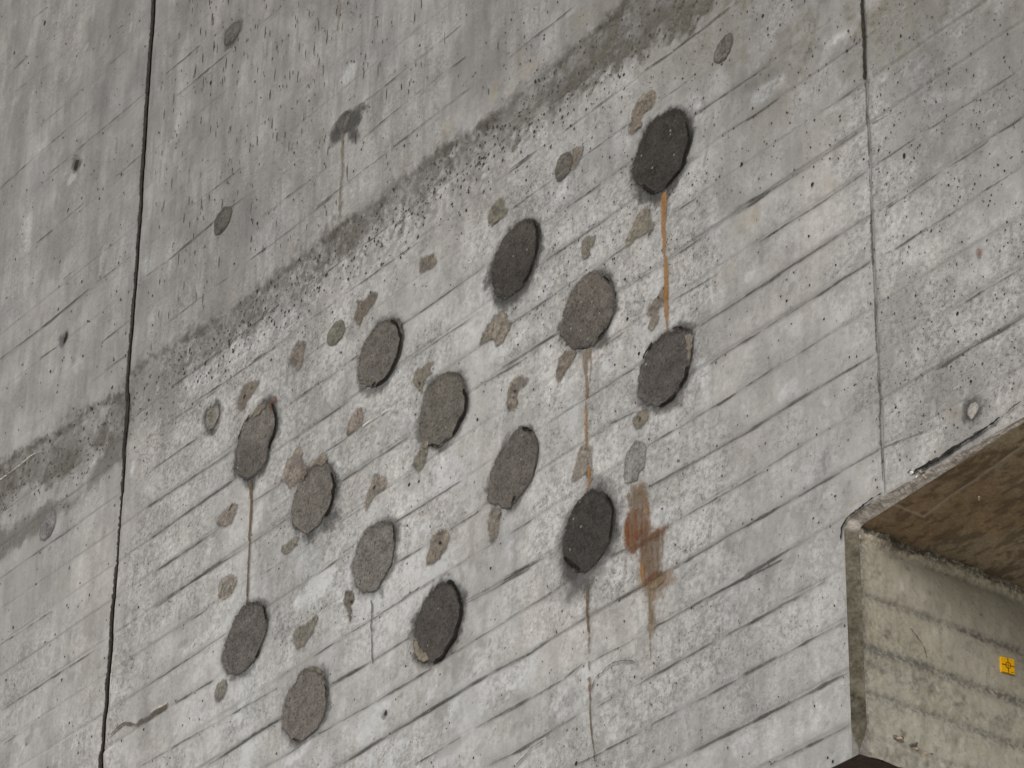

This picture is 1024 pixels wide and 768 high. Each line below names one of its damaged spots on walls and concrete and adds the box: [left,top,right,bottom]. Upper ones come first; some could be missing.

leakage [538,0,713,102]
leakage [323,133,365,254]
leakage [631,163,683,204]
leakage [484,227,543,309]
corrosion [661,191,669,329]
corrosion [582,350,592,444]
leakage [640,376,690,412]
leakage [0,448,77,502]
leakage [232,397,279,632]
leakage [292,473,339,543]
corrosion [624,483,673,658]